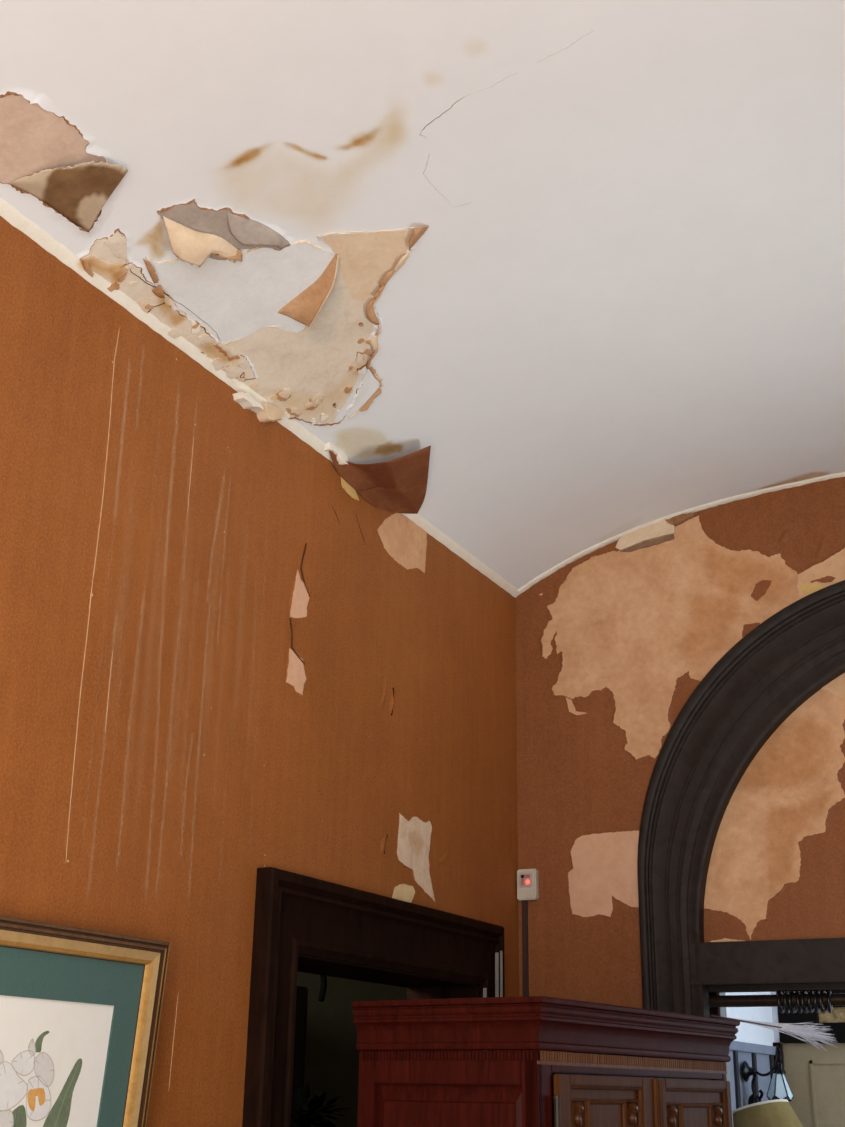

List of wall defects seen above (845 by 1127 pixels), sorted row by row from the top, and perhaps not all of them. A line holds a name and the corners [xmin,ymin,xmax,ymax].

peeling [0,86,429,426]
crack [421,31,592,207]
damp [66,327,120,857]
peeling [324,443,359,501]